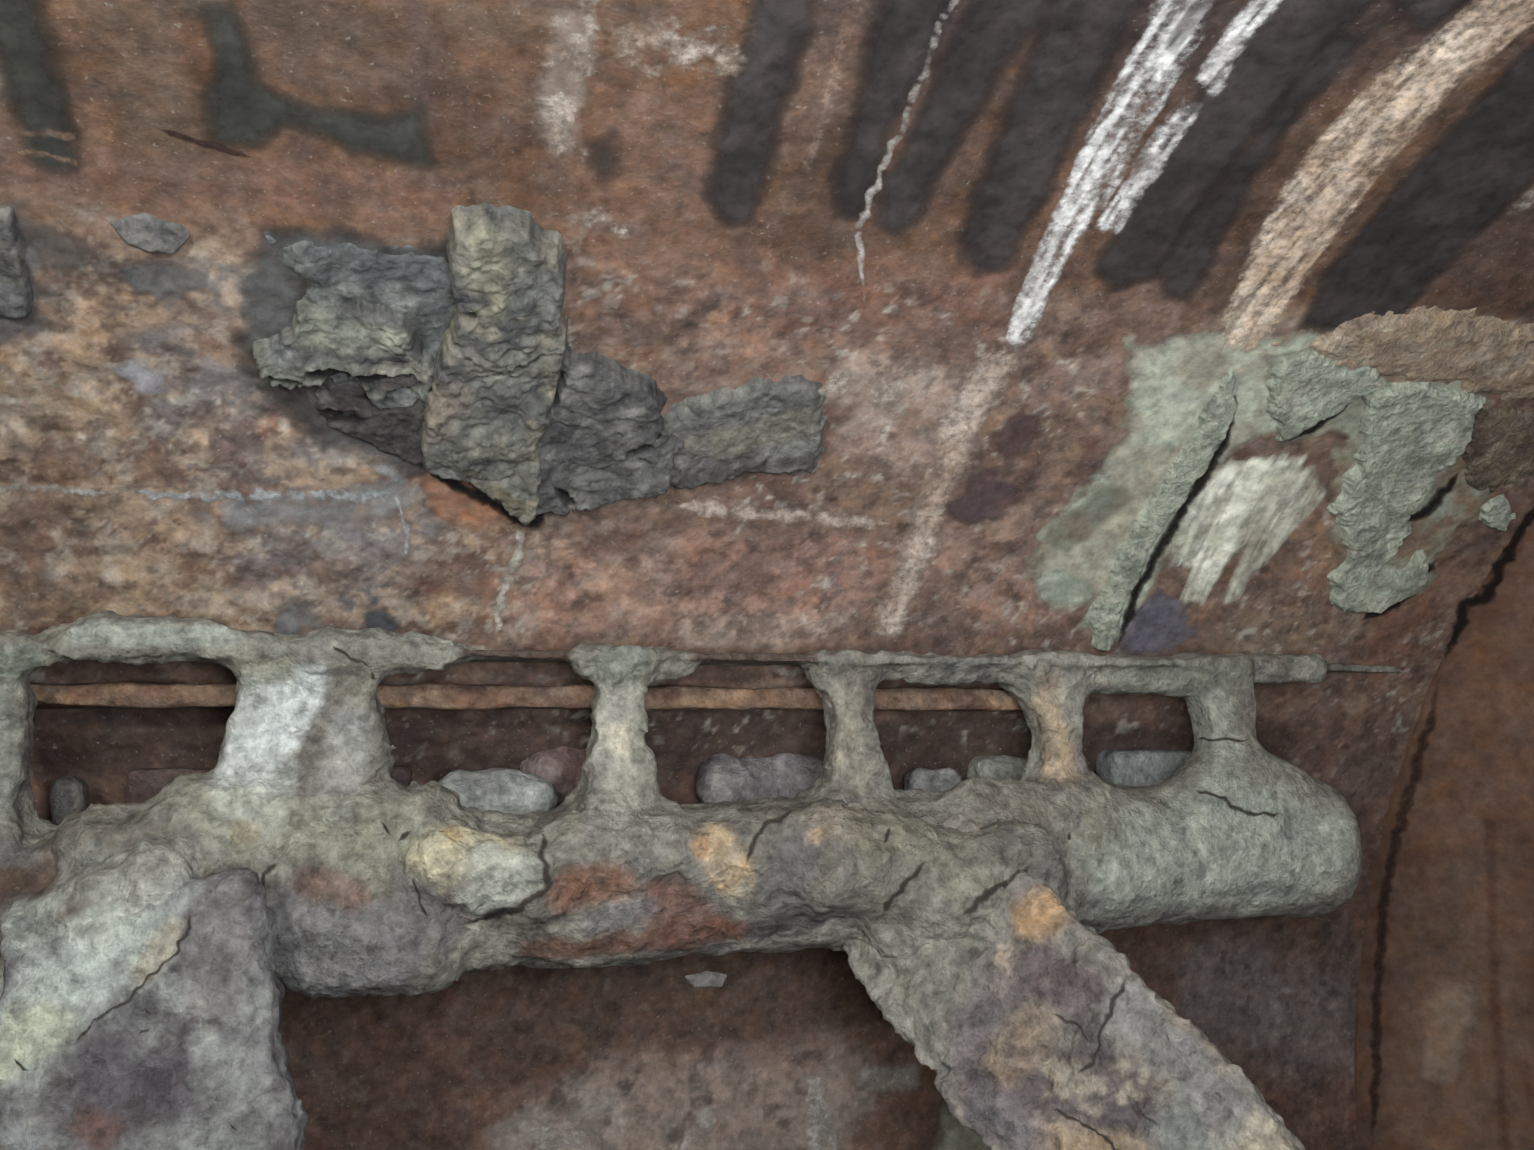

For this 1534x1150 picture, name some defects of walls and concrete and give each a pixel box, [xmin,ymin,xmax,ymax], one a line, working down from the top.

damp [0,0,79,172]
damp [204,6,432,167]
damp [703,0,814,225]
damp [1299,44,1534,331]
damp [833,0,1375,654]